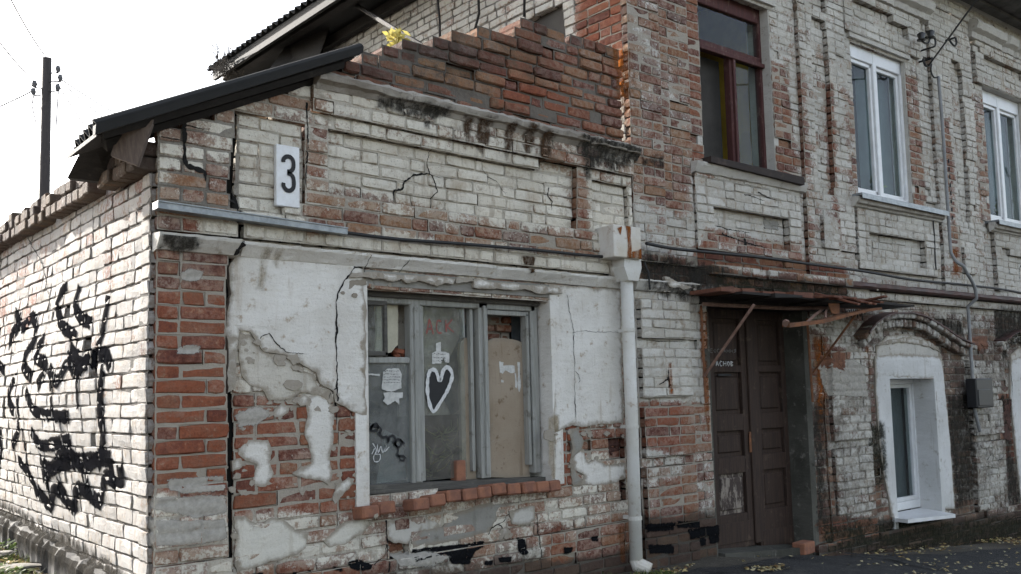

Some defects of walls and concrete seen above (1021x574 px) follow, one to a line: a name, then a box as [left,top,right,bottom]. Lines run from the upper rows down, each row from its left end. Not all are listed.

crack [156,114,246,306]
damp [378,98,450,126]
crack [393,150,440,208]
damp [463,115,494,153]
damp [504,122,555,165]
peeling [181,269,203,281]
crack [329,255,372,424]
peeling [818,350,868,397]
crack [220,392,234,570]
peeling [148,339,449,572]
peeling [543,424,626,501]
damp [812,394,1021,552]